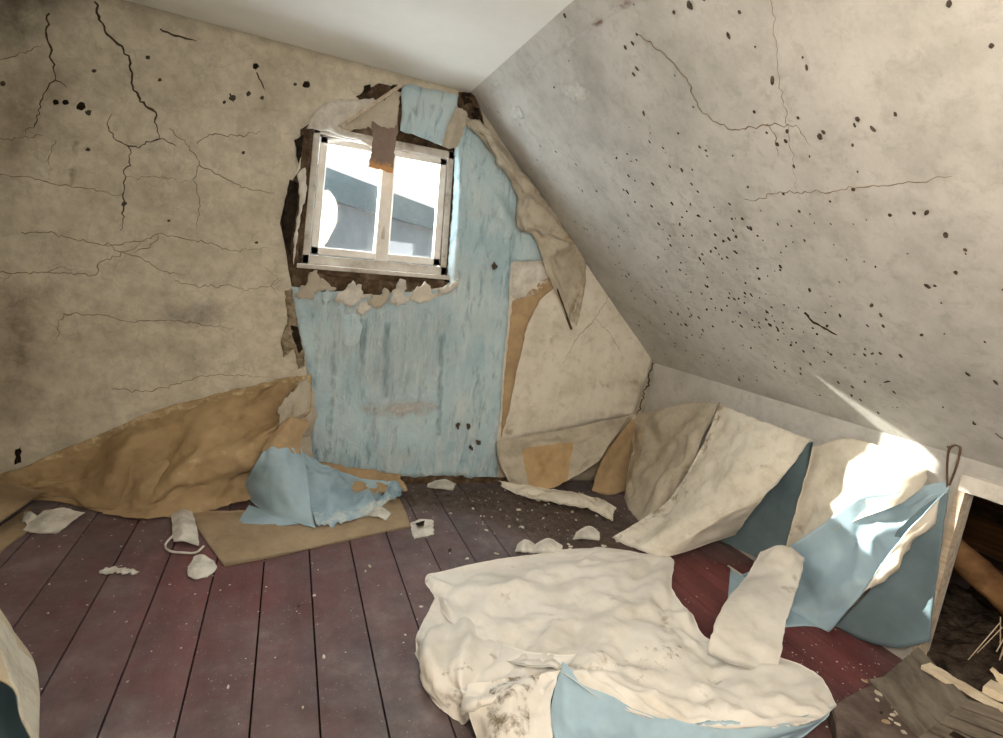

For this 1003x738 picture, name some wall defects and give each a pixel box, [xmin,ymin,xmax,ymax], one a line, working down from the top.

spalling [457,92,484,125]
crack [0,1,286,296]
spalling [281,83,447,369]
crack [56,312,233,340]
spalling [400,475,509,493]